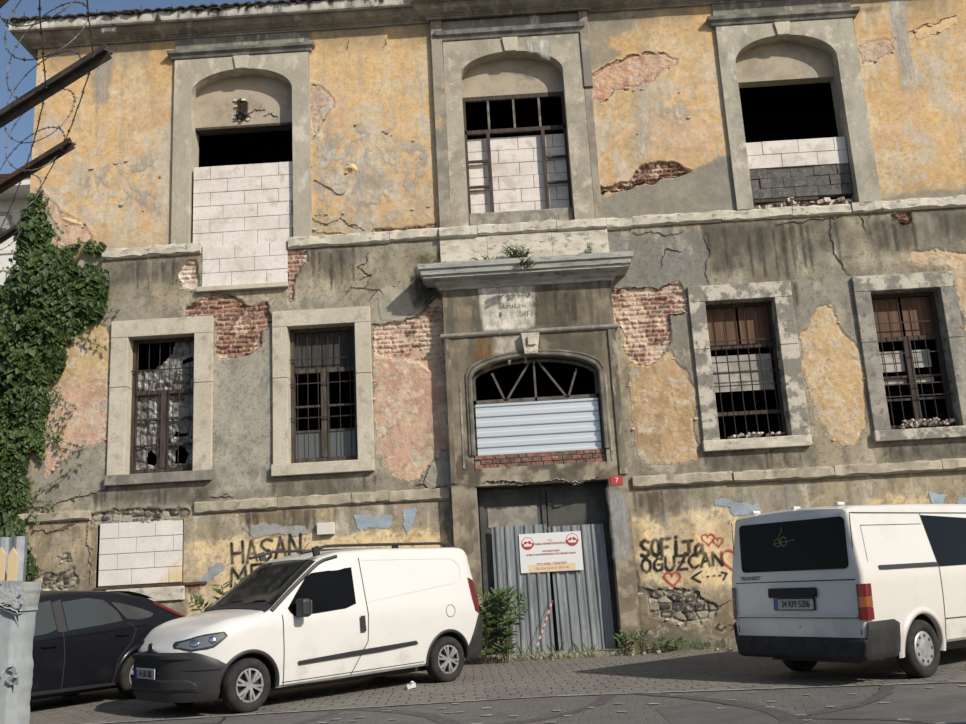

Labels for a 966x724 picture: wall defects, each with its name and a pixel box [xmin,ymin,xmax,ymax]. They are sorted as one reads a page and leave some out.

peeling [587,51,678,102]
flaking render [600,101,692,193]
crack [314,180,363,234]
flaking render [177,260,273,359]
flaking render [286,249,308,302]
crack [347,252,439,326]
water stain [716,223,813,275]
peeling [908,248,966,331]
peeling [372,298,449,482]
peeling [611,281,701,466]
peeling [799,304,867,446]
flaking render [638,587,720,627]